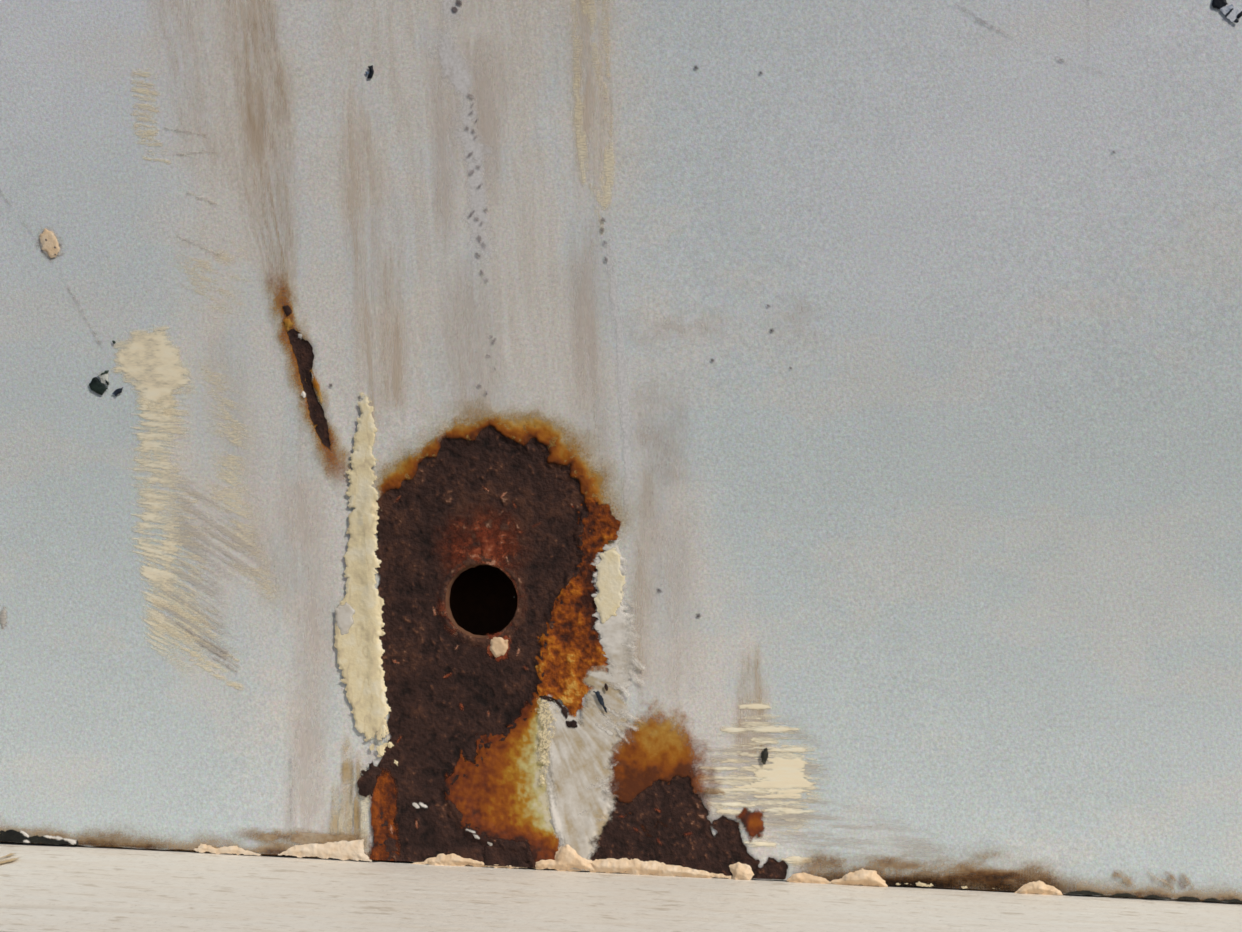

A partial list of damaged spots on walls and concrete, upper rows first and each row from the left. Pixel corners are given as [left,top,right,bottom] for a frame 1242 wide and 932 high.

rust [273,283,345,473]
peeling [89,326,270,689]
water stain [0,827,370,858]
peeling [330,746,370,850]
peeling [334,392,398,766]
rust [357,408,622,868]
peeling [534,540,645,870]
rust [590,707,788,880]
water stain [802,856,1242,901]